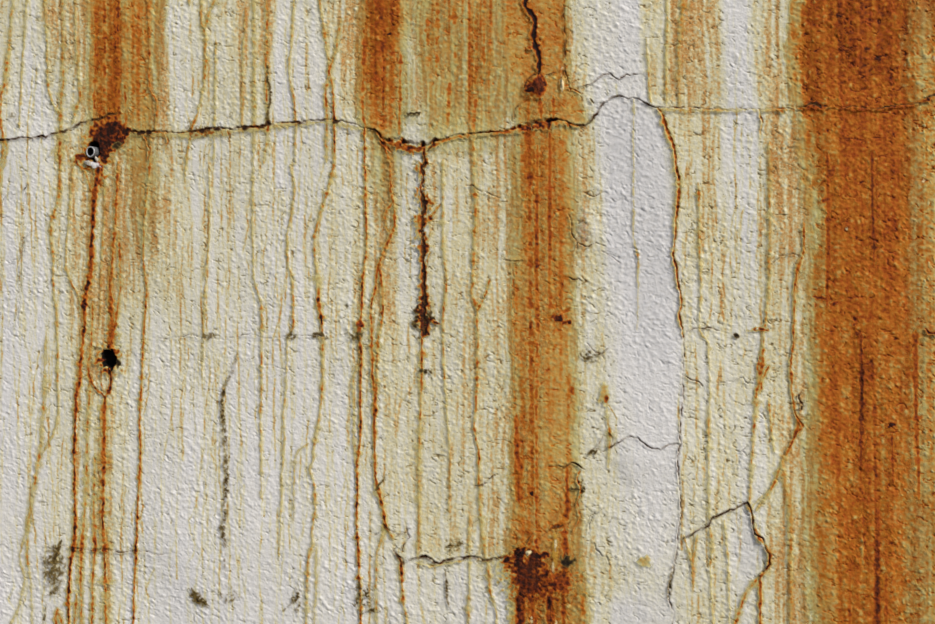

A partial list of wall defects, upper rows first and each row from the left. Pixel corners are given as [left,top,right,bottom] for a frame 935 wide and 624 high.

crack [0,113,116,141]
rust [10,0,167,624]
crack [129,0,636,339]
rust [352,0,593,624]
rust [695,182,711,367]
crack [559,94,935,624]
rust [747,0,935,624]
crack [383,525,516,568]
rust [683,535,698,586]
rust [706,378,715,624]
rust [724,520,764,624]